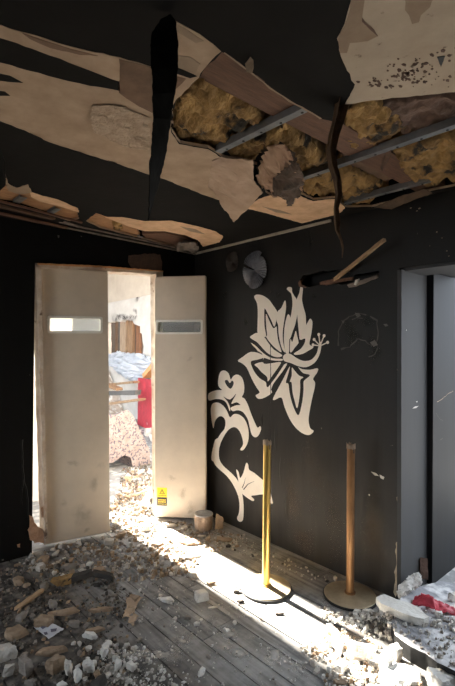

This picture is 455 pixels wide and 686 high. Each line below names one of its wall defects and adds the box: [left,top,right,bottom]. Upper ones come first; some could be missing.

peeling [0,25,153,174]
peeling [172,21,221,109]
peeling [337,0,455,104]
peeling [6,178,79,212]
peeling [160,121,220,200]
spalling [320,275,379,288]